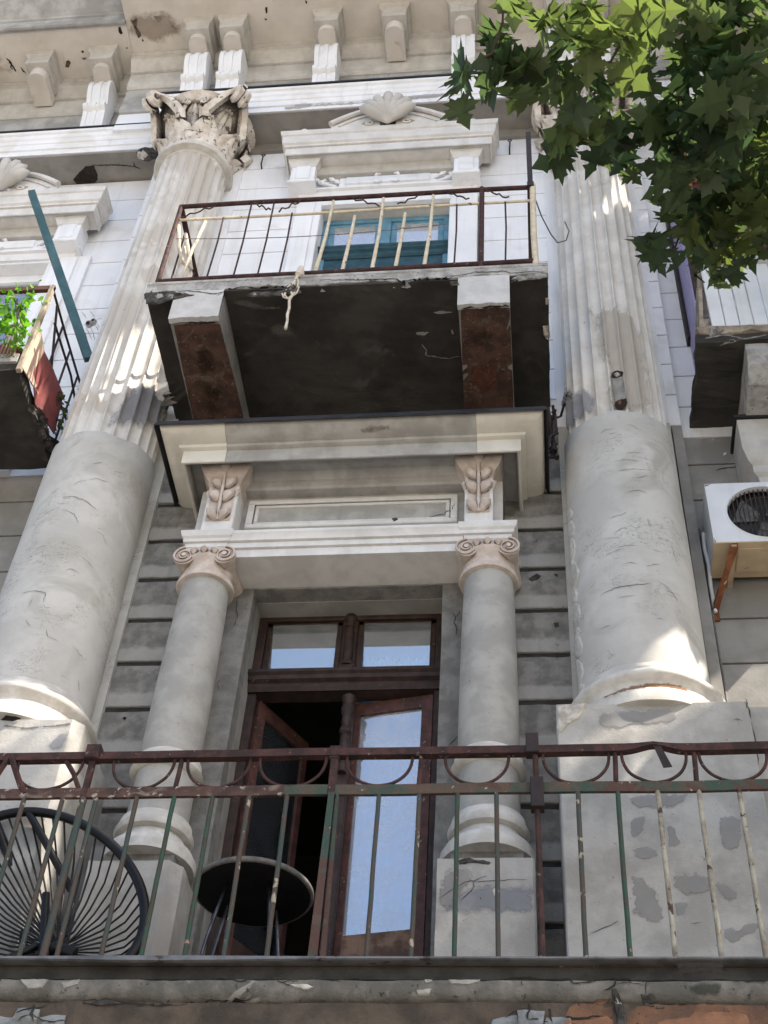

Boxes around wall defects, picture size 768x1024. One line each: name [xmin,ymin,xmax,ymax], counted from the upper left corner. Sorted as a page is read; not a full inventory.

spalling [73,166,98,184]
crack [437,876,525,900]
spalling [20,979,48,989]
spalling [416,979,432,996]
spalling [81,998,250,1006]
flaking render [564,988,768,1024]